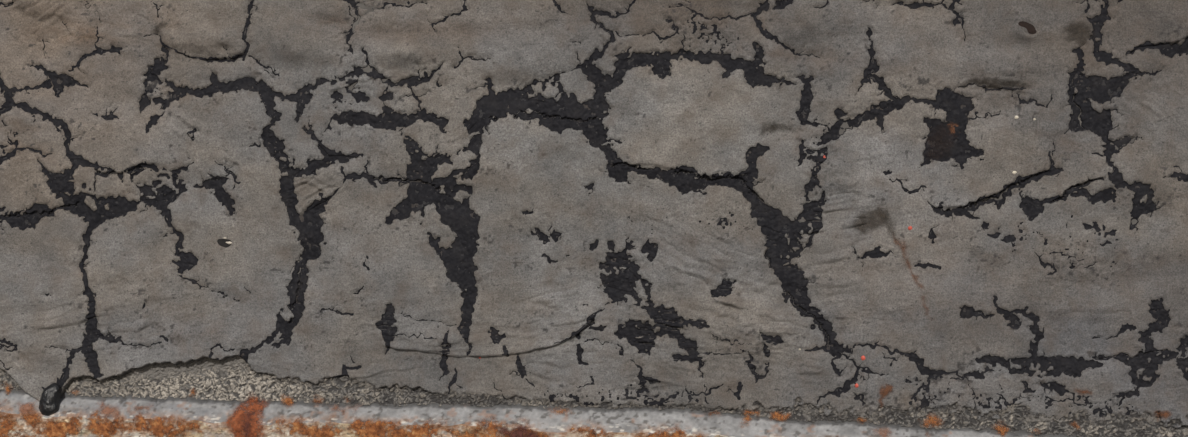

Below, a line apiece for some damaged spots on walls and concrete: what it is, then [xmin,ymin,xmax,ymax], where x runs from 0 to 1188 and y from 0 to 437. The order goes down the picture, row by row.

peeling [330,99,449,133]
peeling [912,87,984,169]
crack [0,0,241,391]
crack [139,0,443,363]
crack [340,0,1188,409]
peeling [981,215,1119,275]
spalling [63,224,1188,437]
crack [334,356,362,378]
corrosion [0,403,202,437]
corrosion [226,397,548,437]
corrosion [570,427,606,437]
corrosion [639,428,703,437]